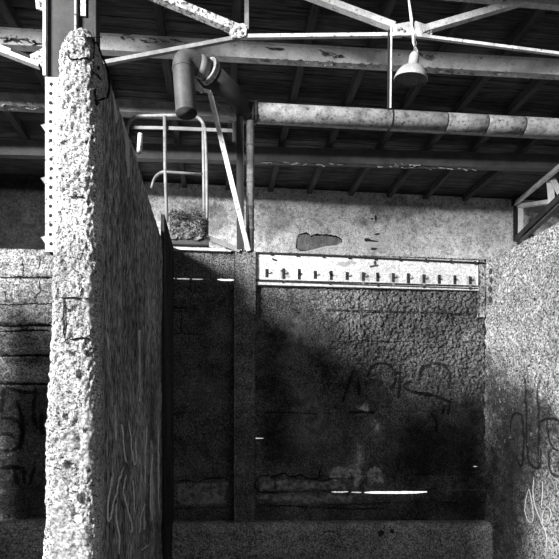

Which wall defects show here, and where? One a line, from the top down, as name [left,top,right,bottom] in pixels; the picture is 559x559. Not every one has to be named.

crack [68,28,110,106]
spalling [296,232,342,252]
crack [256,467,388,510]